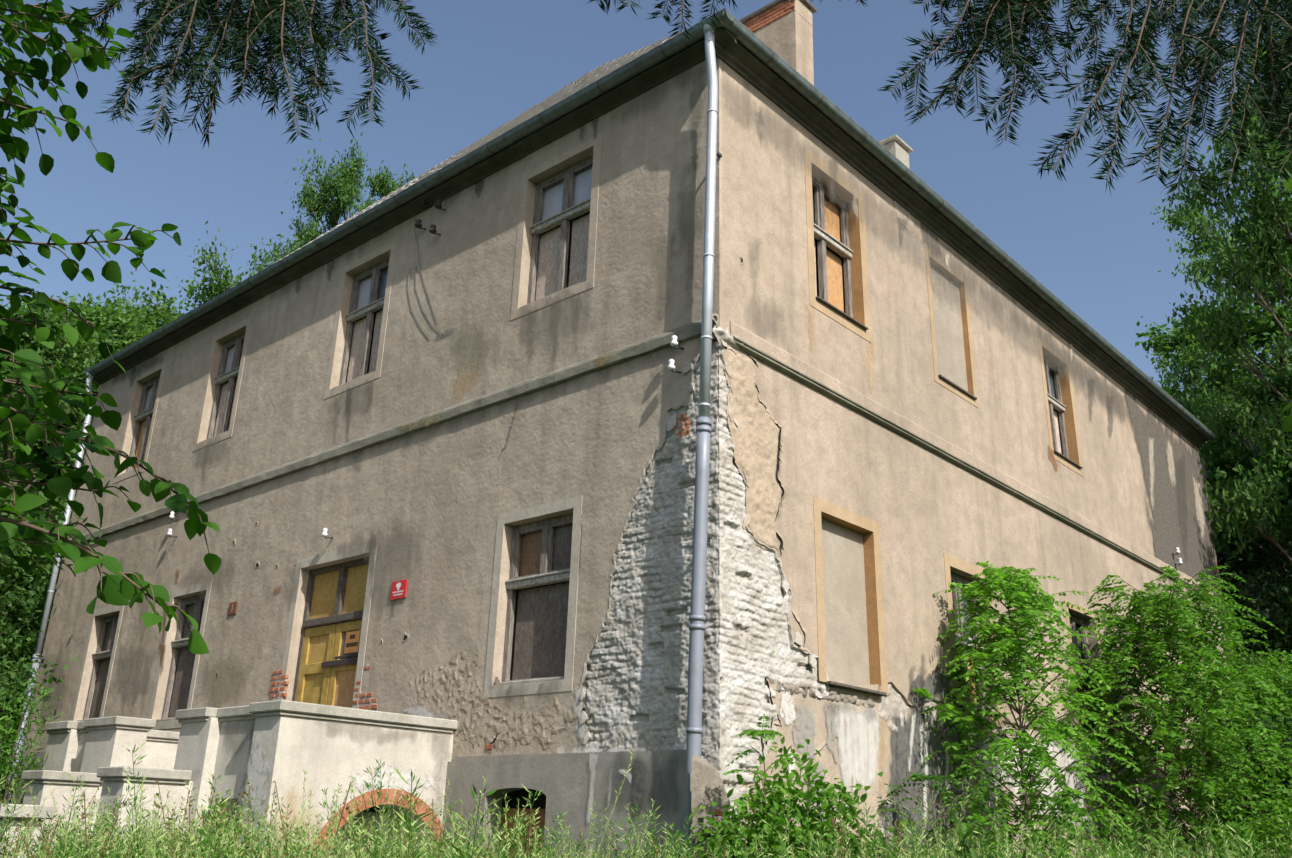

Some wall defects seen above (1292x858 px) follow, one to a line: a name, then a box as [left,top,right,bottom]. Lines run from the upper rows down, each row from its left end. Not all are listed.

crack [498,404,518,458]
crack [726,345,786,554]
peeling [408,313,953,852]
flaking render [269,670,289,698]
flaking render [352,664,378,710]